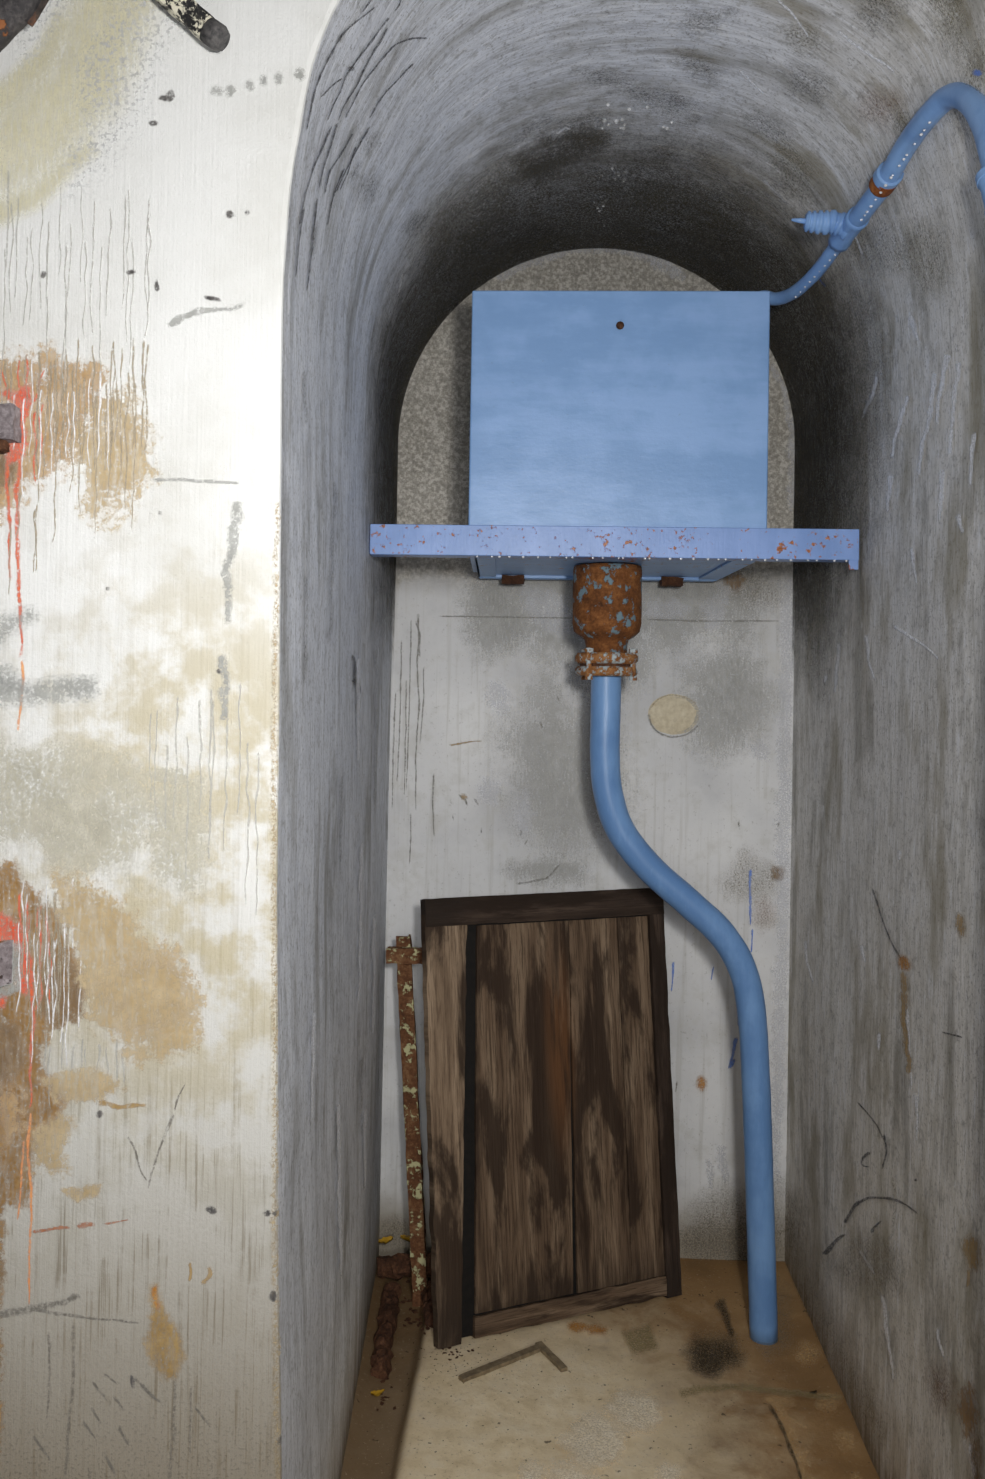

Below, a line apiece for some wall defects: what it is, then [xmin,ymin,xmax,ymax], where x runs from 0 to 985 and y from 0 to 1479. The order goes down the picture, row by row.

rust [0,340,158,729]
rust [0,860,206,1304]
rust [144,1284,184,1379]